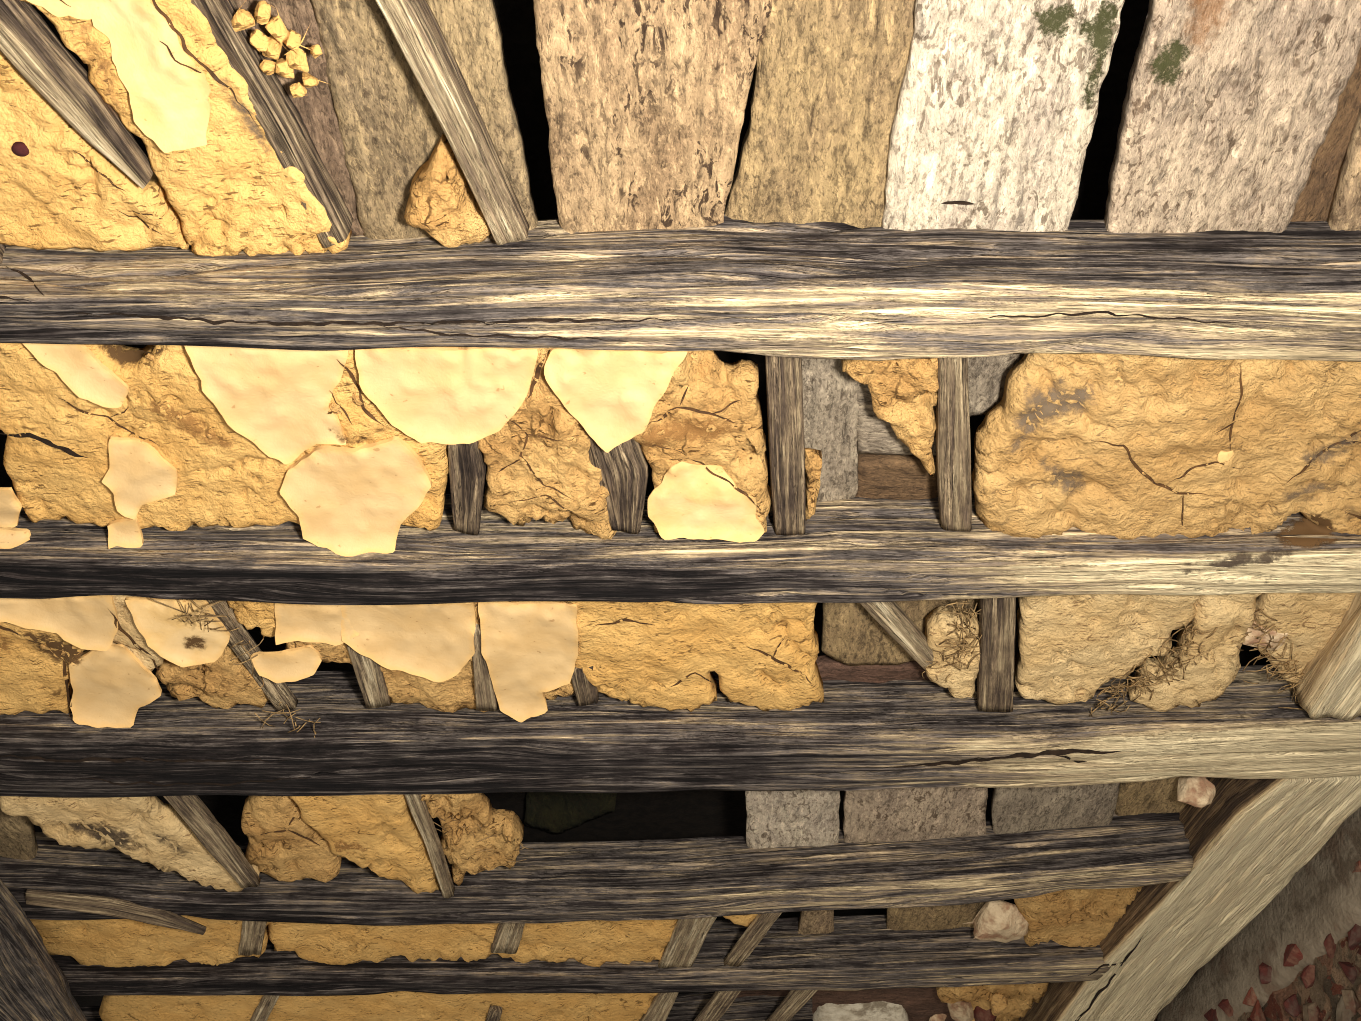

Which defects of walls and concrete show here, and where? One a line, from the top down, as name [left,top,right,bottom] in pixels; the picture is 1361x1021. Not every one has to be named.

peeling [26,0,211,153]
peeling [0,487,31,549]
peeling [22,343,164,408]
peeling [102,436,178,549]
crack [0,266,716,518]
peeling [150,346,731,557]
peeling [648,461,765,543]
crack [1091,371,1243,526]
crack [1282,430,1361,486]
peeling [0,595,230,728]
peeling [250,601,578,722]